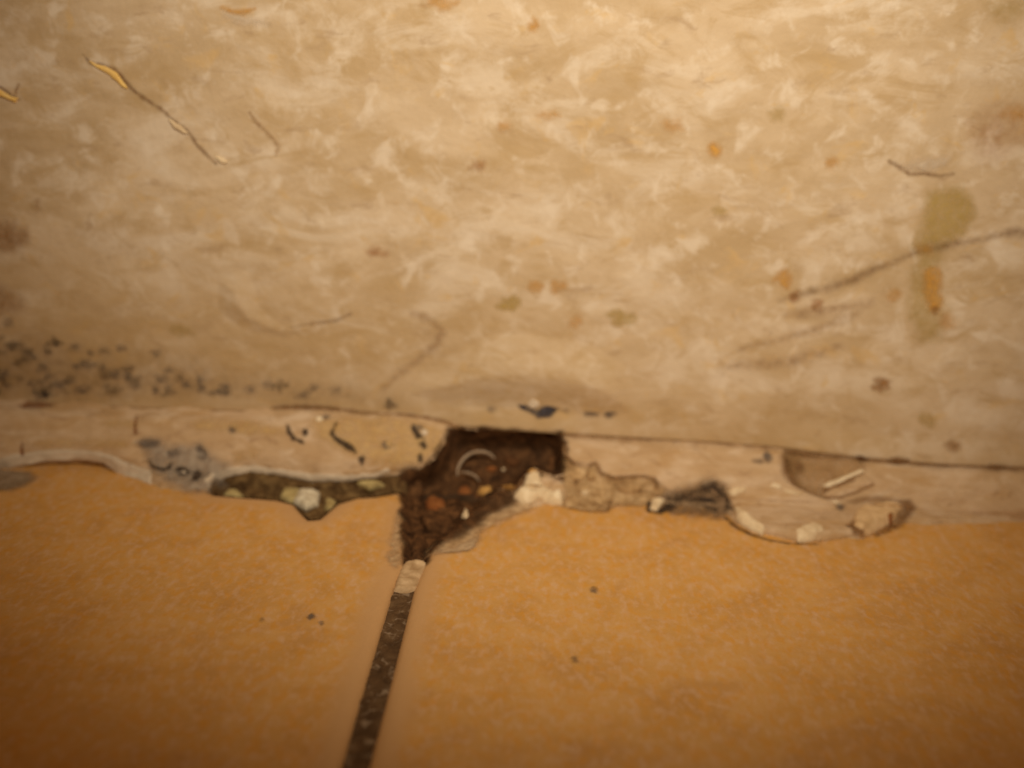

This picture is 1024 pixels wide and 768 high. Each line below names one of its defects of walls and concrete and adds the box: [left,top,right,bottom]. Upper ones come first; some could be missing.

crack [88,60,128,89]
spalling [315,418,665,565]
spalling [784,453,875,499]